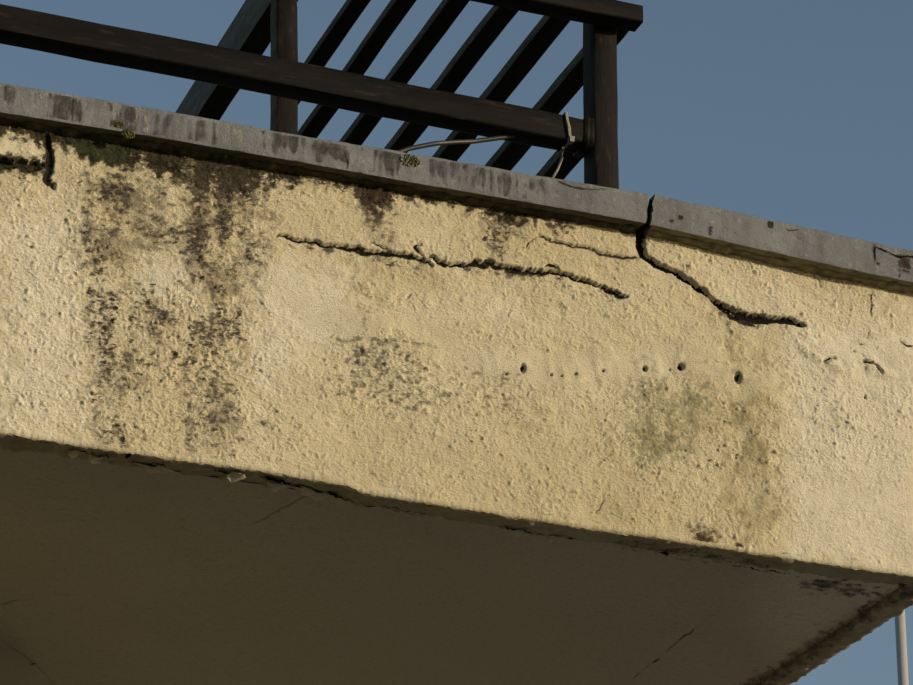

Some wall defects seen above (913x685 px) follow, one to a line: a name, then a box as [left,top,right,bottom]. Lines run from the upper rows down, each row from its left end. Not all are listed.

water stain [50,93,82,122]
water stain [105,102,183,135]
water stain [0,124,458,451]
water stain [466,206,583,280]
crack [278,200,801,327]
rust [899,254,911,276]